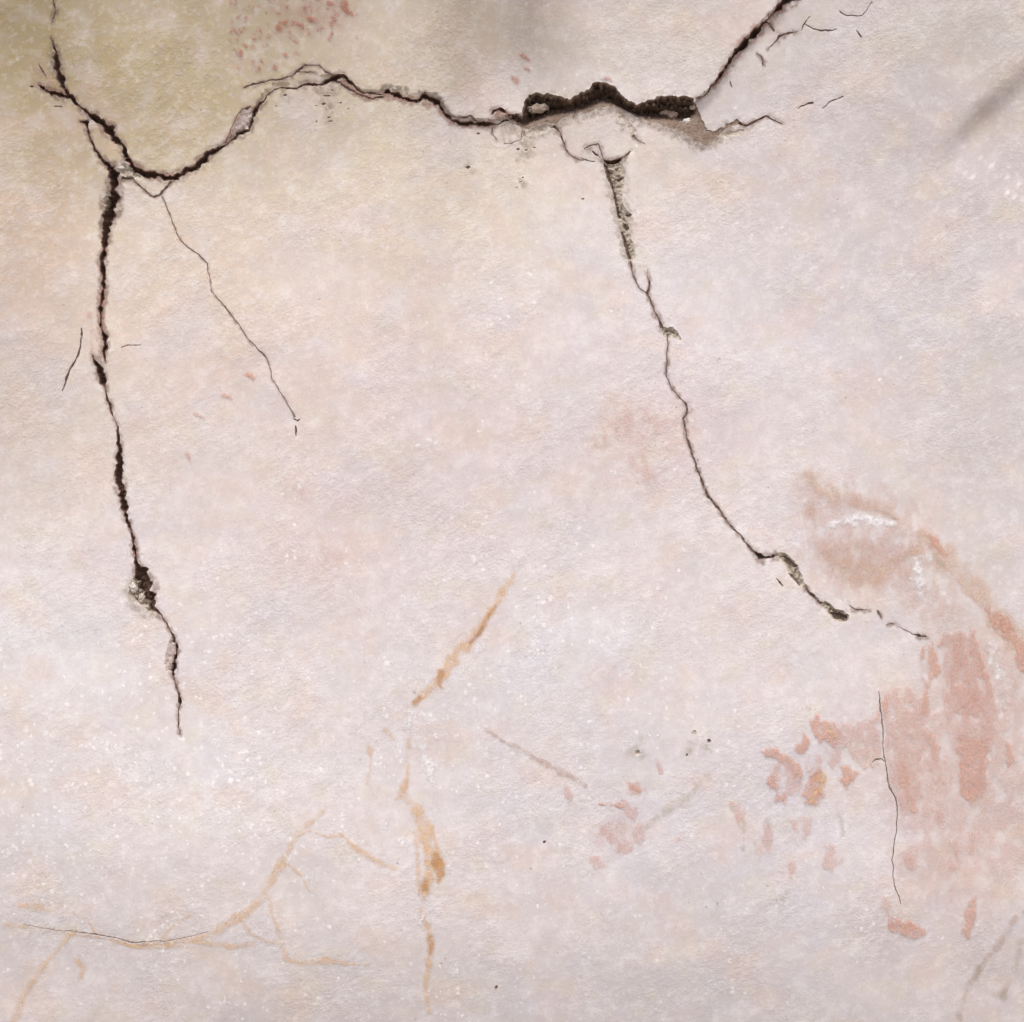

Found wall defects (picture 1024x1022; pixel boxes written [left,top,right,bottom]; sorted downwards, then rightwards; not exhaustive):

crack [30,0,927,735]
corrosion [405,576,513,727]
corrosion [397,806,444,895]
crack [872,694,901,905]